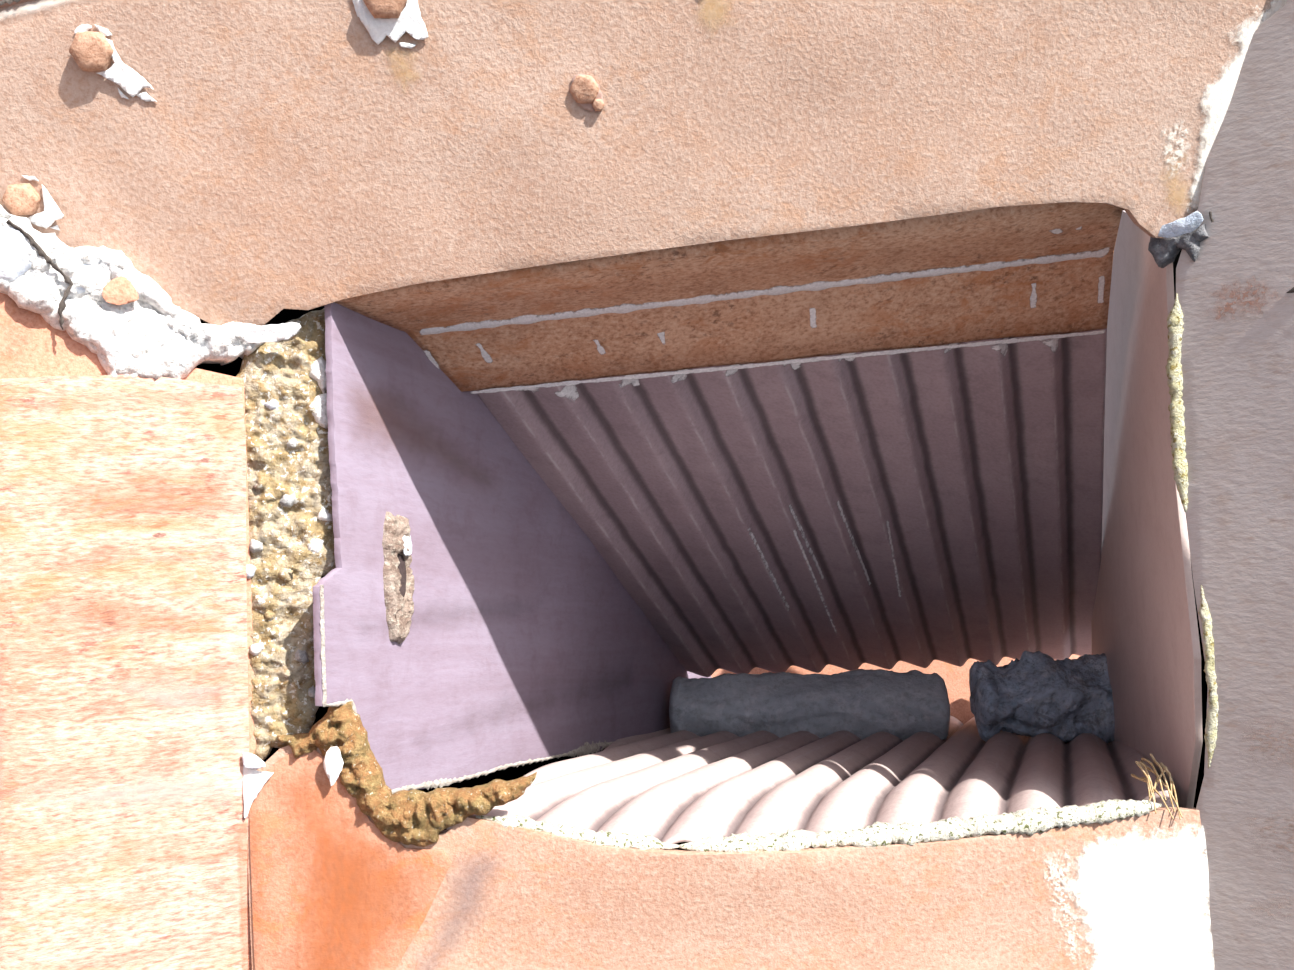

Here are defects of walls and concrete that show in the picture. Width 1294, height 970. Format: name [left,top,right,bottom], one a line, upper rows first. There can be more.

peeling [74,24,157,102]
peeling [352,0,428,49]
peeling [1148,0,1287,268]
crack [6,219,73,330]
spalling [0,175,336,819]
peeling [402,535,412,556]